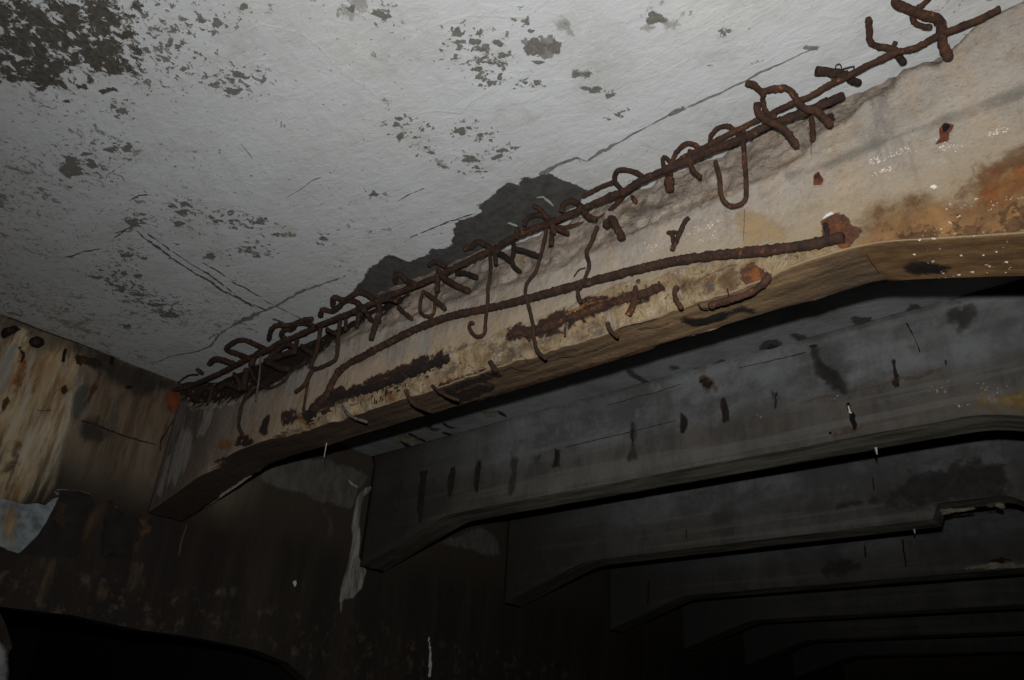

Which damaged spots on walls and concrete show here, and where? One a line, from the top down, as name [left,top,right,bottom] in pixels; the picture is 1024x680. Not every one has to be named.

peeling [0,0,274,123]
crack [64,194,346,363]
peeling [120,193,296,264]
rust [506,281,665,351]
spalling [172,0,1001,437]
crack [539,45,818,175]
rust [681,307,754,327]
rust [681,262,772,293]
rust [813,171,823,185]
rust [820,146,1024,280]
rust [936,123,953,144]
rust [220,345,467,449]